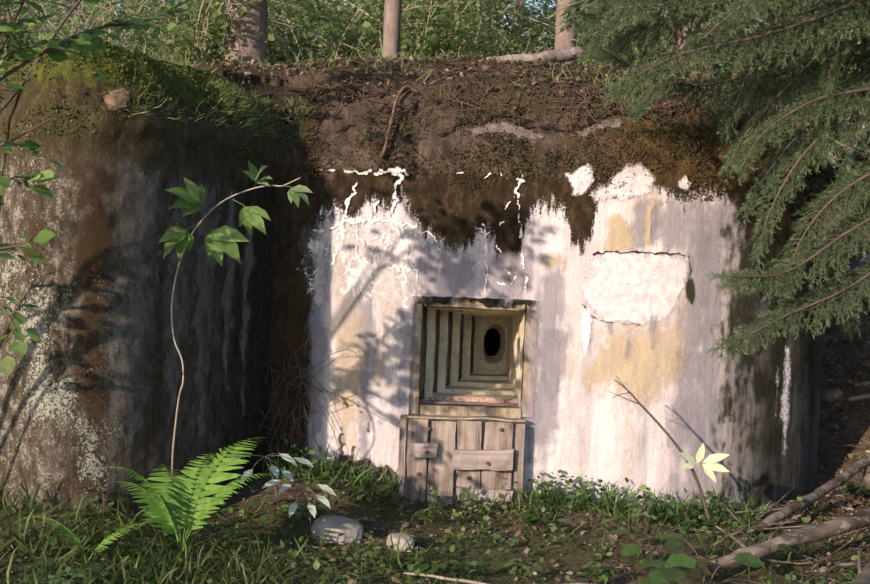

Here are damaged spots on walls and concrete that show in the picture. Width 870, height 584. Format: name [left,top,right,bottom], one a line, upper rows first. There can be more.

leakage [99,159,255,457]
leakage [298,166,531,461]
leakage [527,270,567,489]
peeling [565,165,654,201]
spalling [562,250,695,463]
leakage [633,204,645,247]
leakage [659,181,820,509]